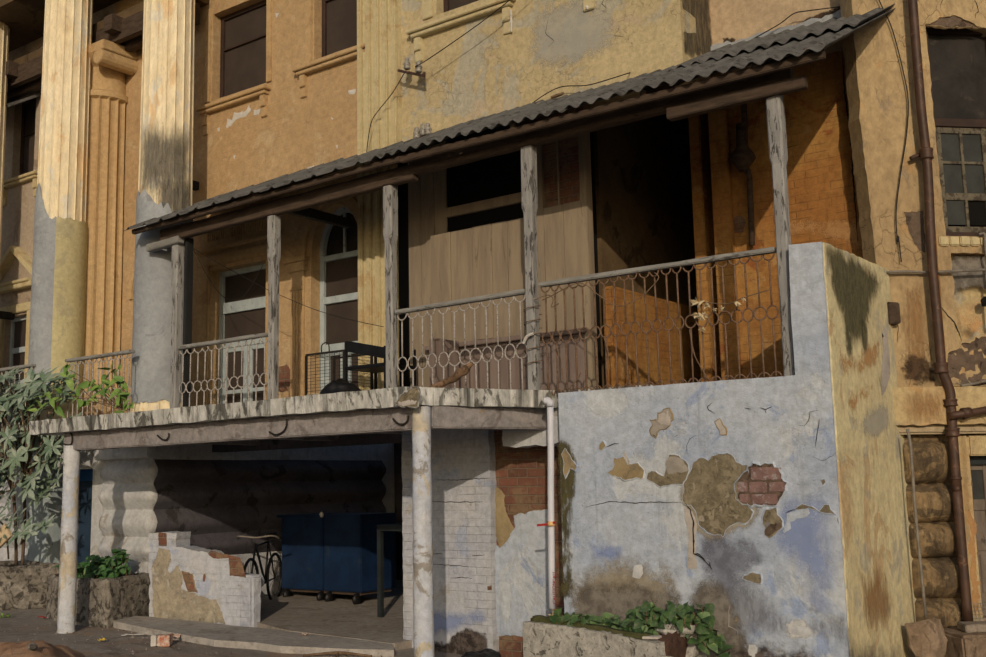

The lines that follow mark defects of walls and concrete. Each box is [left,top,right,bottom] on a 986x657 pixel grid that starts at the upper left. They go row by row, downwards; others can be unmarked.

peeling [217,106,260,131]
leakage [827,249,879,371]
flaking render [946,334,986,387]
flaking render [649,407,674,439]
flaking render [561,448,578,479]
flaking render [608,452,837,539]
flaking render [151,532,227,625]
flaking render [208,550,246,578]
leakage [557,441,677,621]
crack [582,501,712,569]
leakage [680,483,814,657]